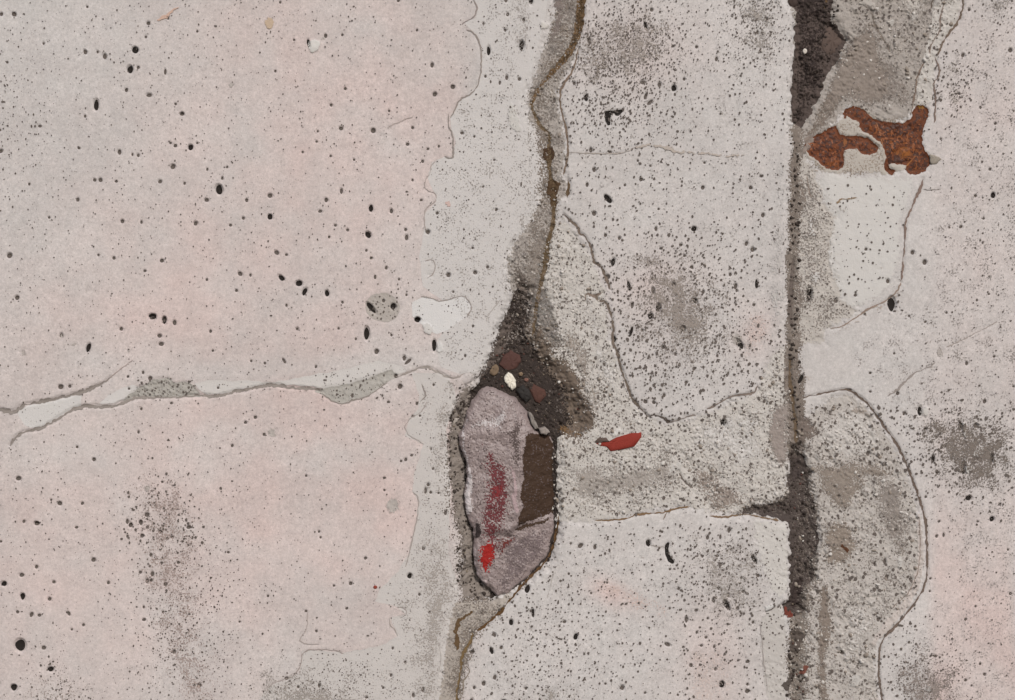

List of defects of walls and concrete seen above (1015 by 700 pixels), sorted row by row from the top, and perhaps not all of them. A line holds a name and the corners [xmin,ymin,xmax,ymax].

crack [0,360,465,446]
peeling [100,361,406,404]
crack [424,0,482,230]
crack [421,259,501,320]
peeling [260,0,918,700]
crack [530,0,758,423]
crack [787,257,795,328]
crack [793,129,811,222]
rust [807,105,928,173]
peeling [786,0,961,345]
crack [788,312,1015,700]
crack [435,516,559,700]